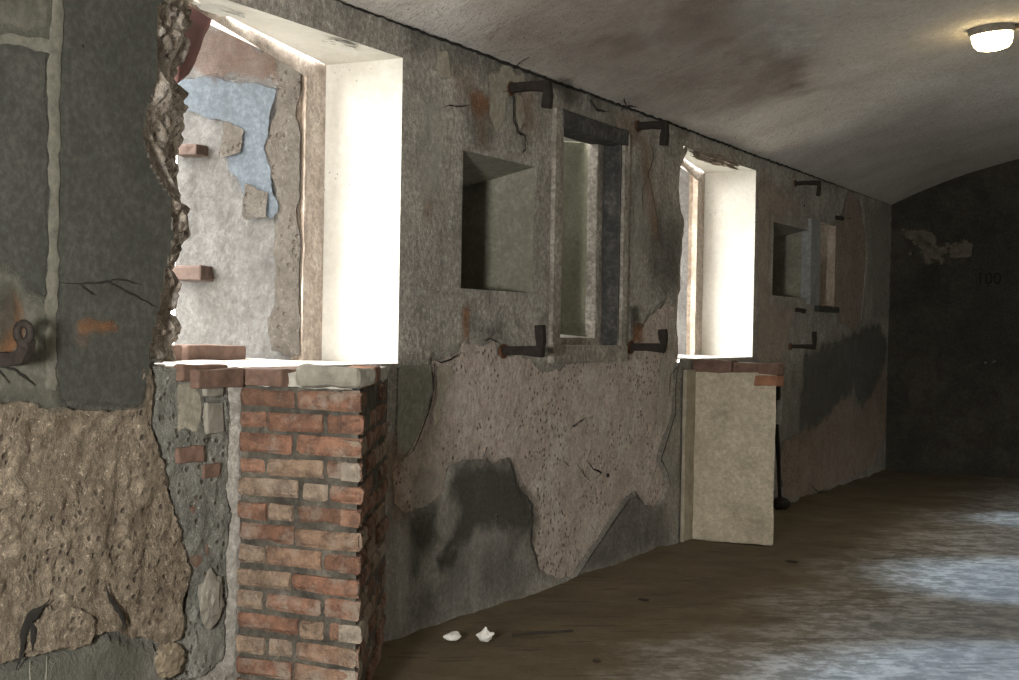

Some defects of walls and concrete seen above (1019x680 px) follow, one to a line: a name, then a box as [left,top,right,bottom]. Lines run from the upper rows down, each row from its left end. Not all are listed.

spalling [190,2,246,20]
flaking render [194,31,301,357]
damp [800,325,886,429]
spalling [393,303,675,579]
spalling [0,364,231,679]
damp [412,514,435,550]
damp [439,465,537,567]
crack [16,599,50,670]
crack [105,583,127,632]